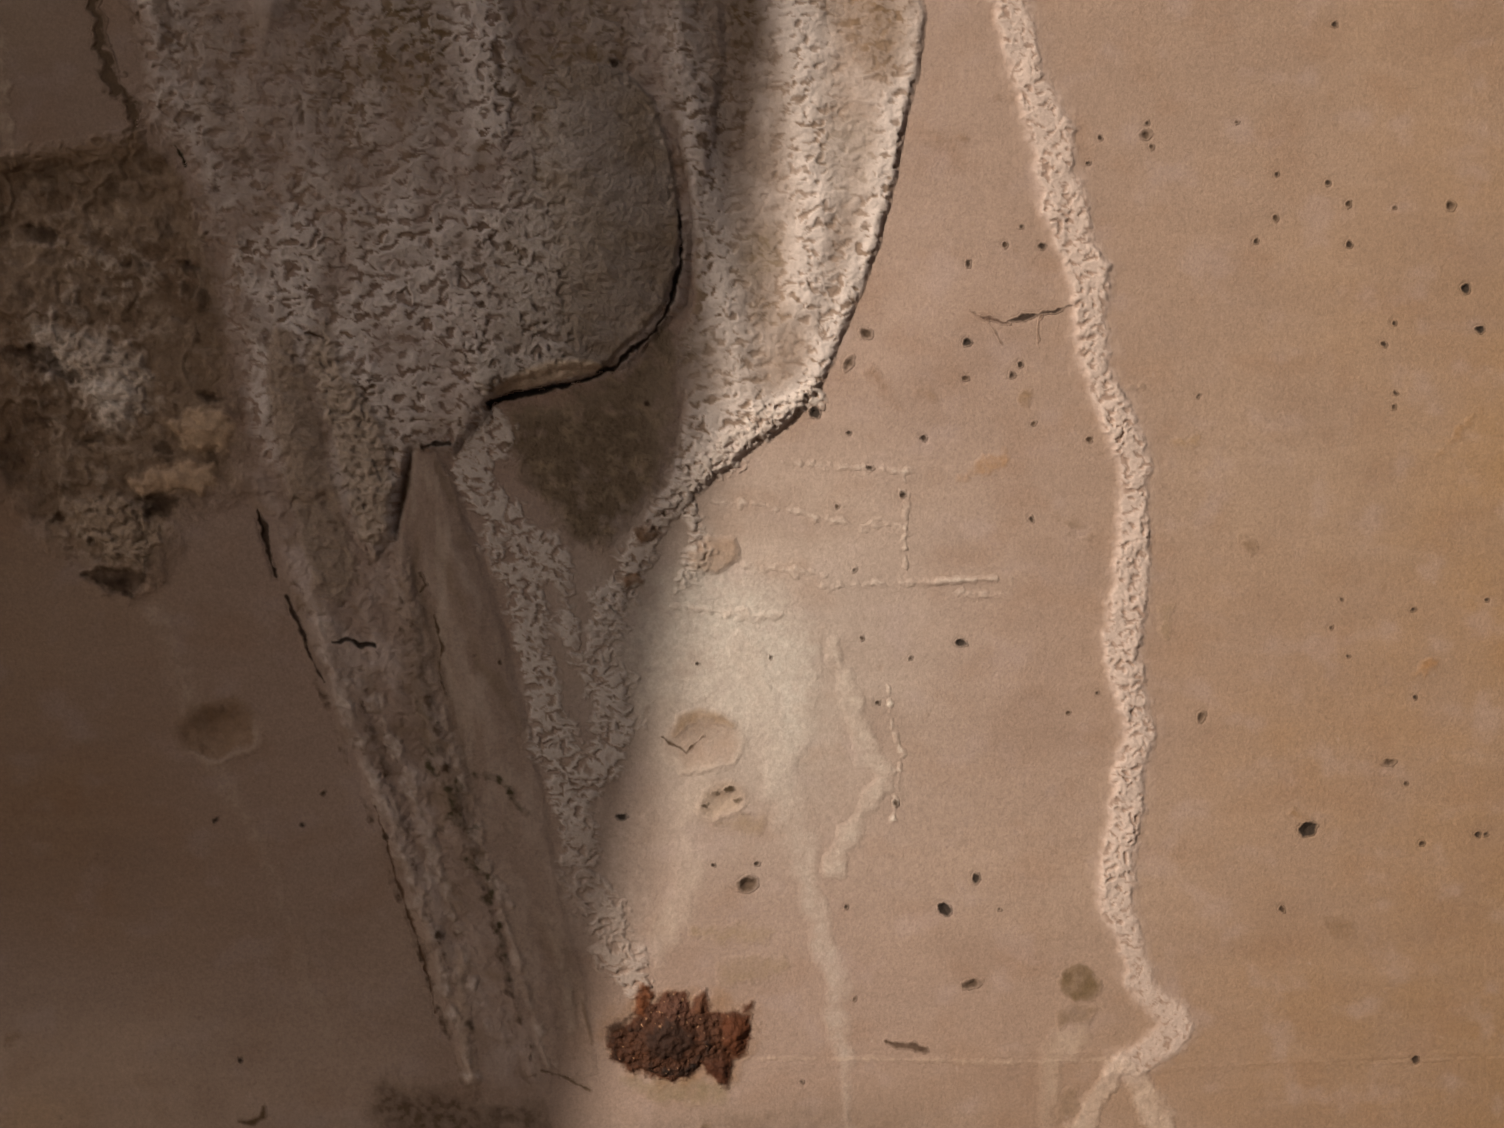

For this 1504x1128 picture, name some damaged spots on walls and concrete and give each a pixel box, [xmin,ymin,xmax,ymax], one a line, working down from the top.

crack [969,304,1074,349]
spalling [0,142,599,1097]
crack [255,508,377,684]
crack [417,570,447,695]
damp [0,0,1013,1128]
damp [972,0,1208,1128]
crack [373,804,438,1015]
corrosion [590,979,771,1116]